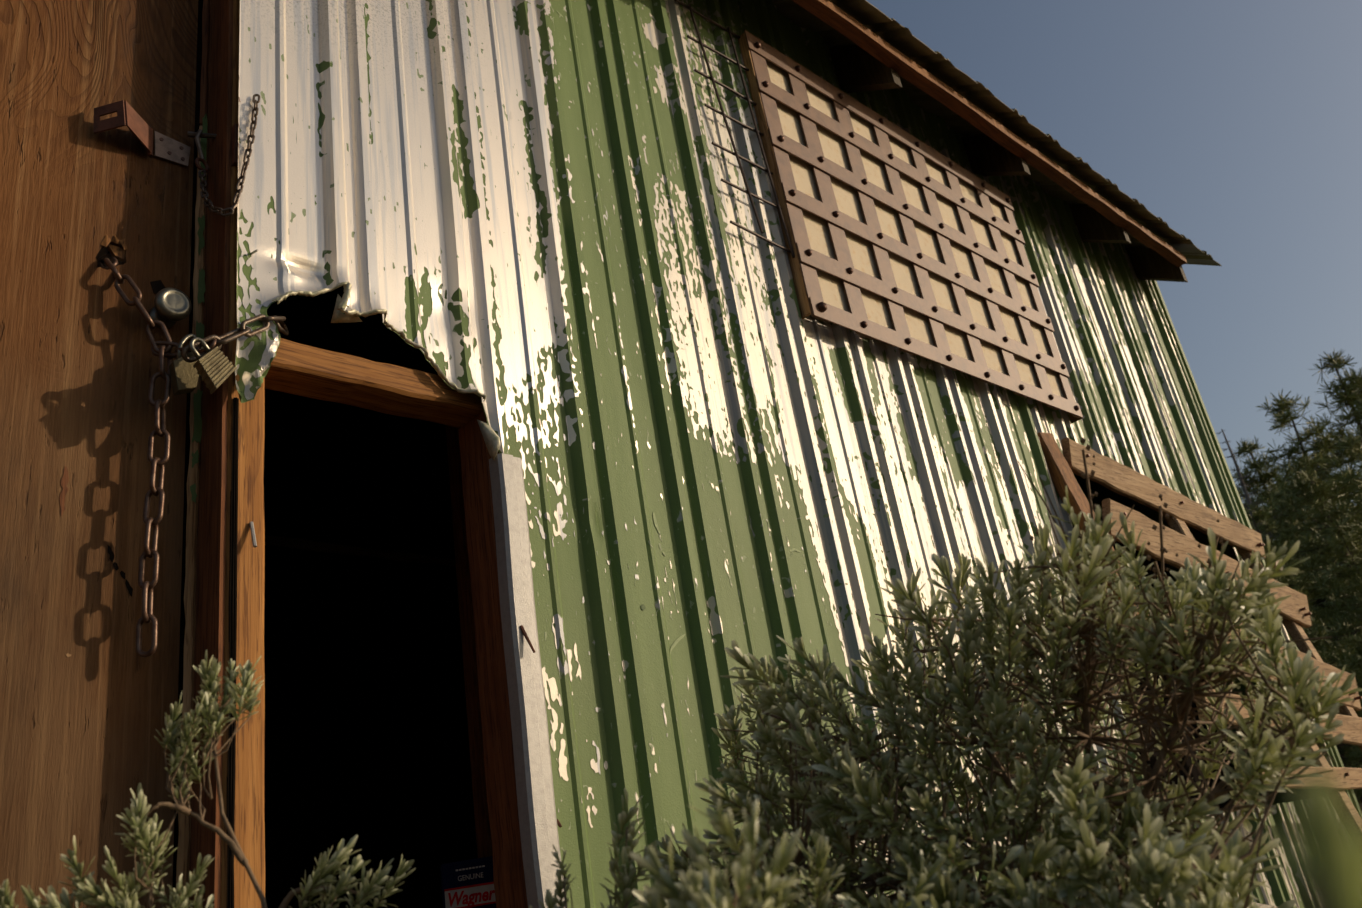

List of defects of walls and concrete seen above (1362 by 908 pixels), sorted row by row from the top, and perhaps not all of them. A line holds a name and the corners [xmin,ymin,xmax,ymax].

peeling [235,0,1308,908]